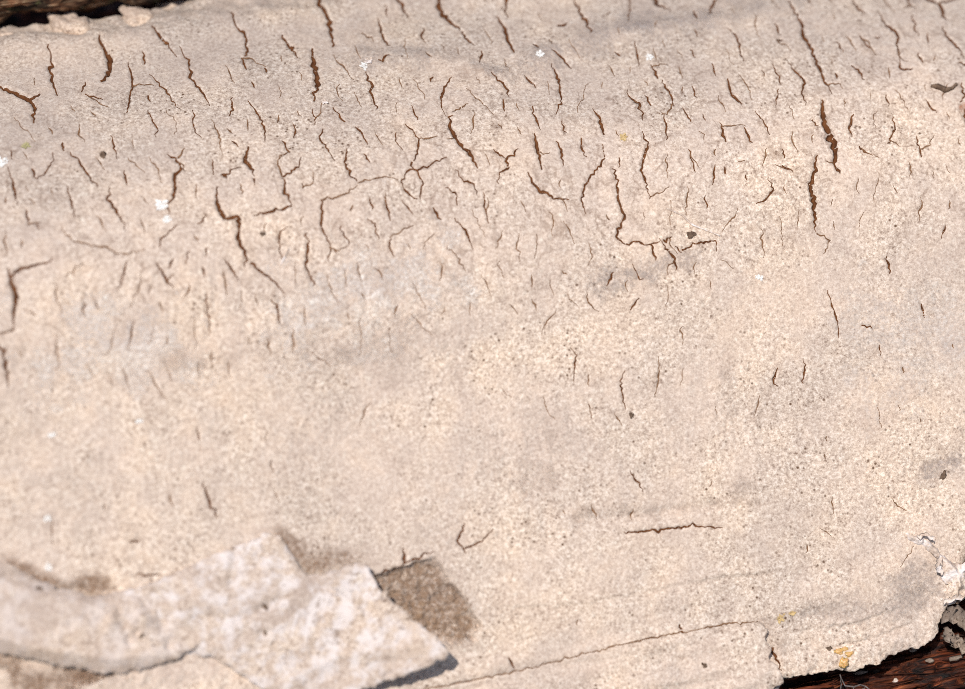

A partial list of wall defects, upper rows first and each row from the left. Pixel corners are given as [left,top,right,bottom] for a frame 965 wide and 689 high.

crack [0,0,965,402]
crack [570,347,626,425]
crack [754,367,778,416]
crack [202,483,218,518]
crack [624,470,722,534]
peeling [906,532,965,605]
crack [424,621,758,689]